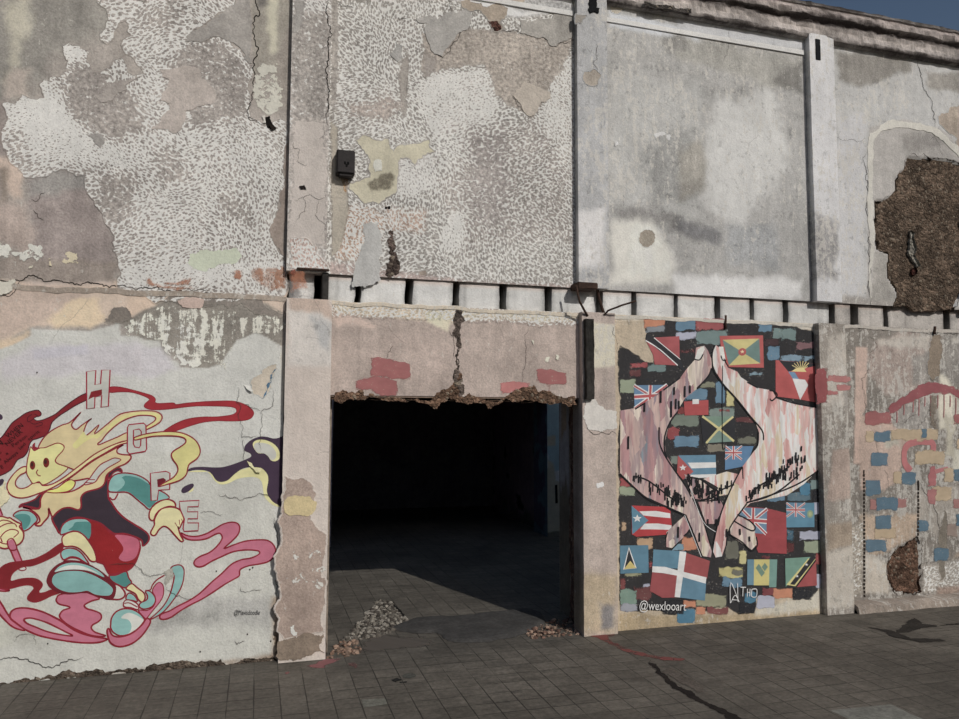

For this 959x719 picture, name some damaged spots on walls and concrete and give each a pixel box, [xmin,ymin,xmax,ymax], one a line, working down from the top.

crack [247,0,263,125]
flaking render [937,104,959,146]
flaking render [0,0,330,369]
flaking render [348,134,435,209]
spalling [874,153,959,313]
crack [0,275,208,297]
spalling [334,309,617,432]
flaking render [0,476,328,684]
spalling [886,537,924,596]
spalling [937,560,946,583]
spalling [937,510,948,549]